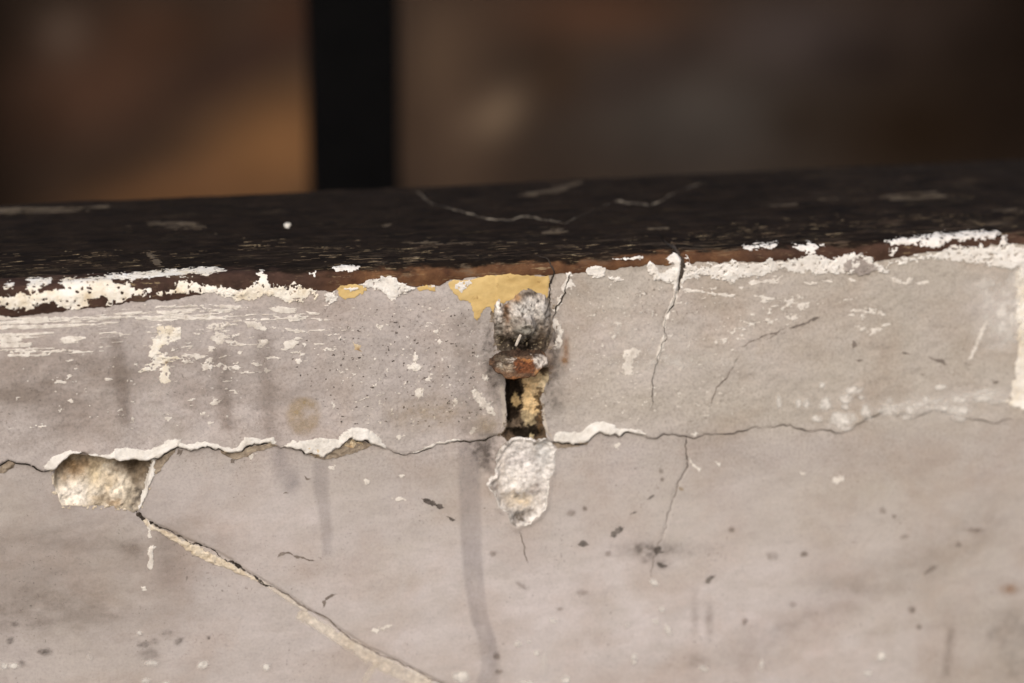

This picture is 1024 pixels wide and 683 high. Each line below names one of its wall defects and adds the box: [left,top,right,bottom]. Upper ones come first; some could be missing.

crack [0,427,498,475]
spalling [0,237,556,527]
crack [652,239,686,405]
crack [711,317,819,404]
crack [553,410,1007,583]
crack [136,511,442,683]